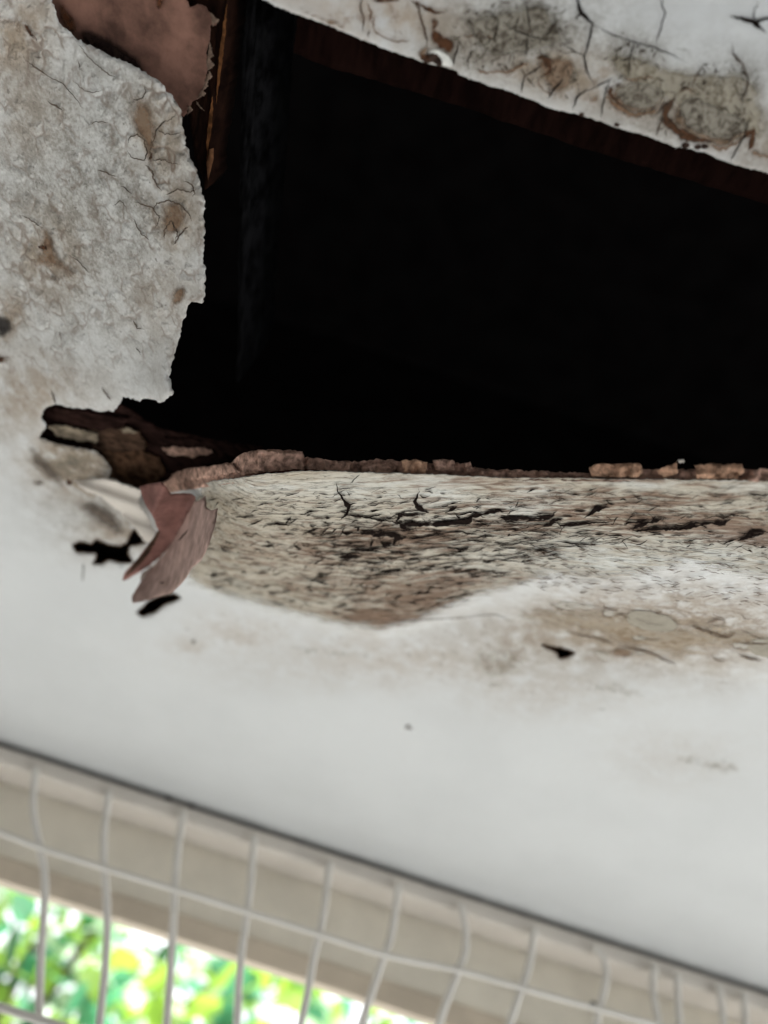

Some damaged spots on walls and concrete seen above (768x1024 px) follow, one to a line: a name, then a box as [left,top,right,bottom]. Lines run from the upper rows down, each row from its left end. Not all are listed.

crack [29,45,117,125]
crack [359,0,370,37]
spalling [420,50,453,67]
leakage [464,5,577,95]
crack [411,0,768,162]
leakage [591,55,768,158]
crack [98,116,195,244]
spalling [75,449,768,603]
crack [206,475,768,620]